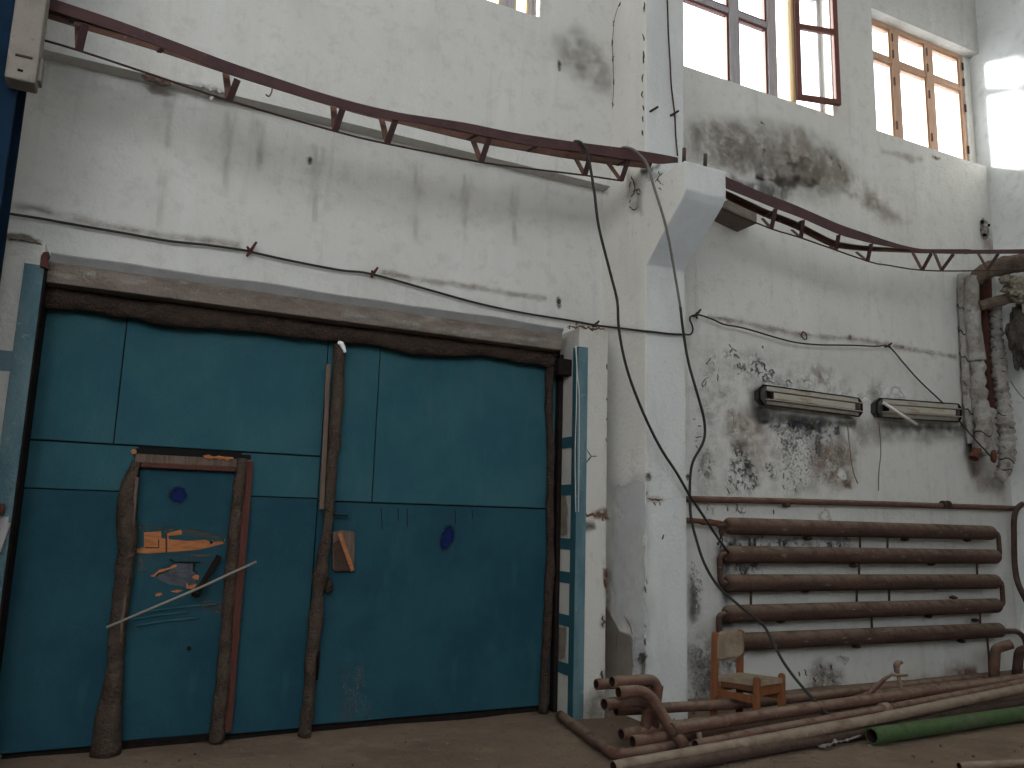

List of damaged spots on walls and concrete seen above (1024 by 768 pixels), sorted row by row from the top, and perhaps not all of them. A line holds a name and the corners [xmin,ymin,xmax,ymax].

damp [765,412,854,492]
flaking render [600,609,648,678]